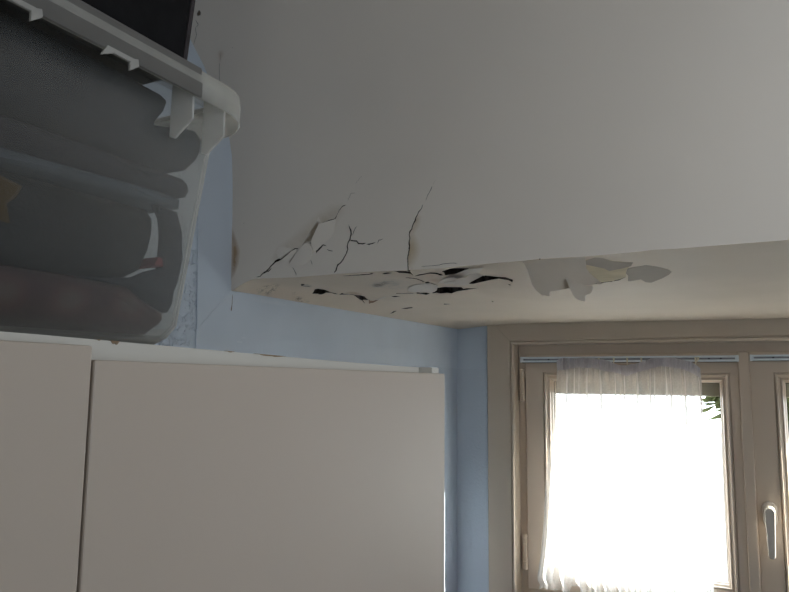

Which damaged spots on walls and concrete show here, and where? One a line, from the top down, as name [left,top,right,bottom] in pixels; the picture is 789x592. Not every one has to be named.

crack [258,176,382,277]
crack [407,183,449,272]
peeling [312,267,513,304]
peeling [522,257,671,301]